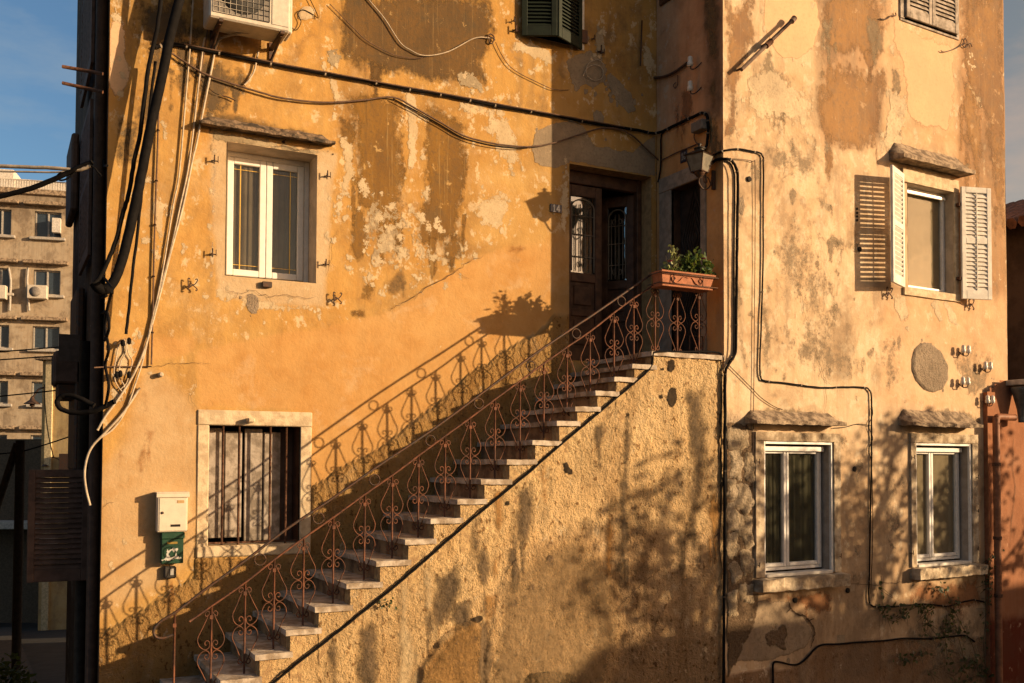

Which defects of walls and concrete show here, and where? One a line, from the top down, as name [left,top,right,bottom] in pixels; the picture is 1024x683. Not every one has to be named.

peeling [202,130,478,324]
water stain [339,0,495,277]
peeling [475,184,511,245]
water stain [760,52,791,88]
water stain [773,0,902,179]
spalling [726,422,812,677]